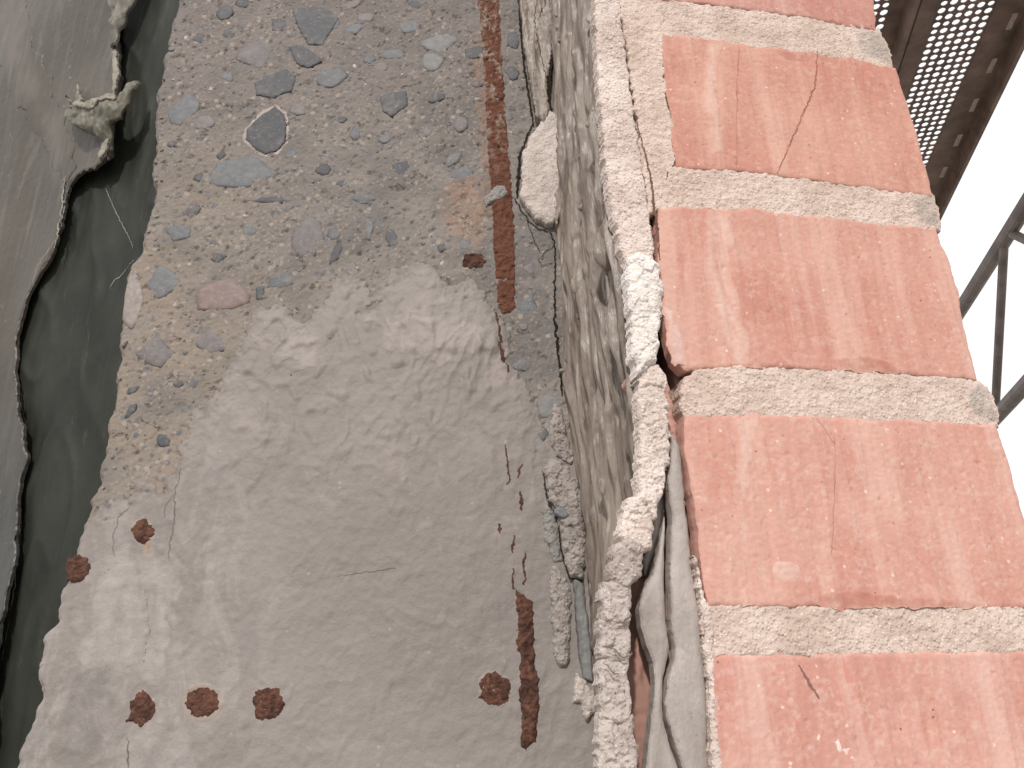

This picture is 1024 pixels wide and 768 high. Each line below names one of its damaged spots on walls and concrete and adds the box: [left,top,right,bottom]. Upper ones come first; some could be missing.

crack [777,48,818,173]
corrosion [432,31,493,269]
crack [514,0,563,396]
crack [635,114,676,260]
spalling [88,0,708,768]
corrosion [66,554,91,582]
corrosion [131,516,155,558]
corrosion [511,535,527,589]
corrosion [125,688,157,727]
corrosion [181,683,225,723]
corrosion [252,687,286,721]
corrosion [478,670,512,707]